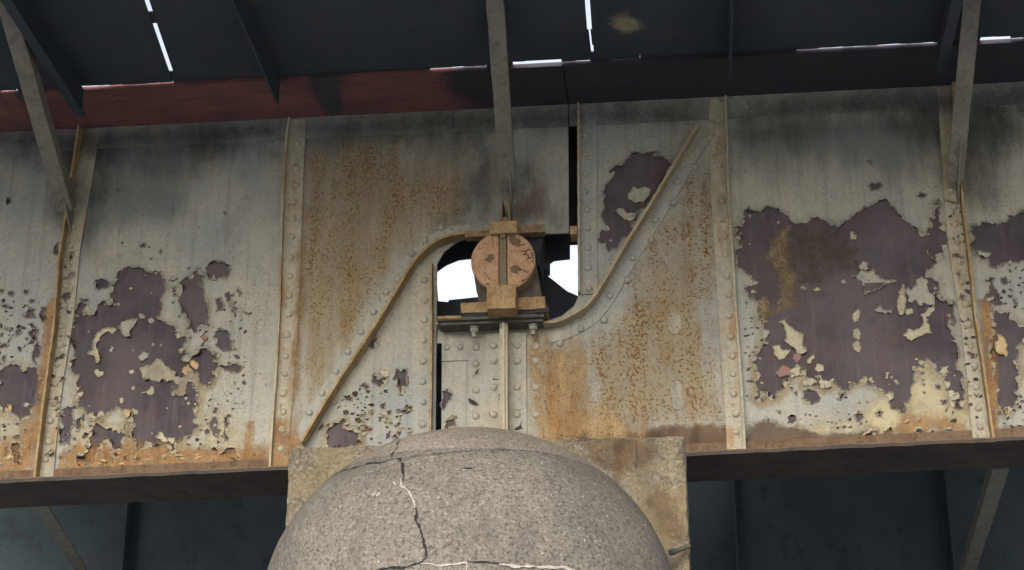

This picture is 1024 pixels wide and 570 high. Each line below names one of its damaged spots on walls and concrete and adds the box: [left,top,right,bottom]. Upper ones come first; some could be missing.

peeling [597,150,674,252]
peeling [0,231,252,467]
corrosion [59,414,299,469]
peeling [317,367,413,448]
spalling [440,387,459,429]
crack [325,436,637,482]
corrosion [528,333,727,444]
corrosion [746,363,970,441]
peeling [733,181,1024,436]
crack [376,506,427,570]